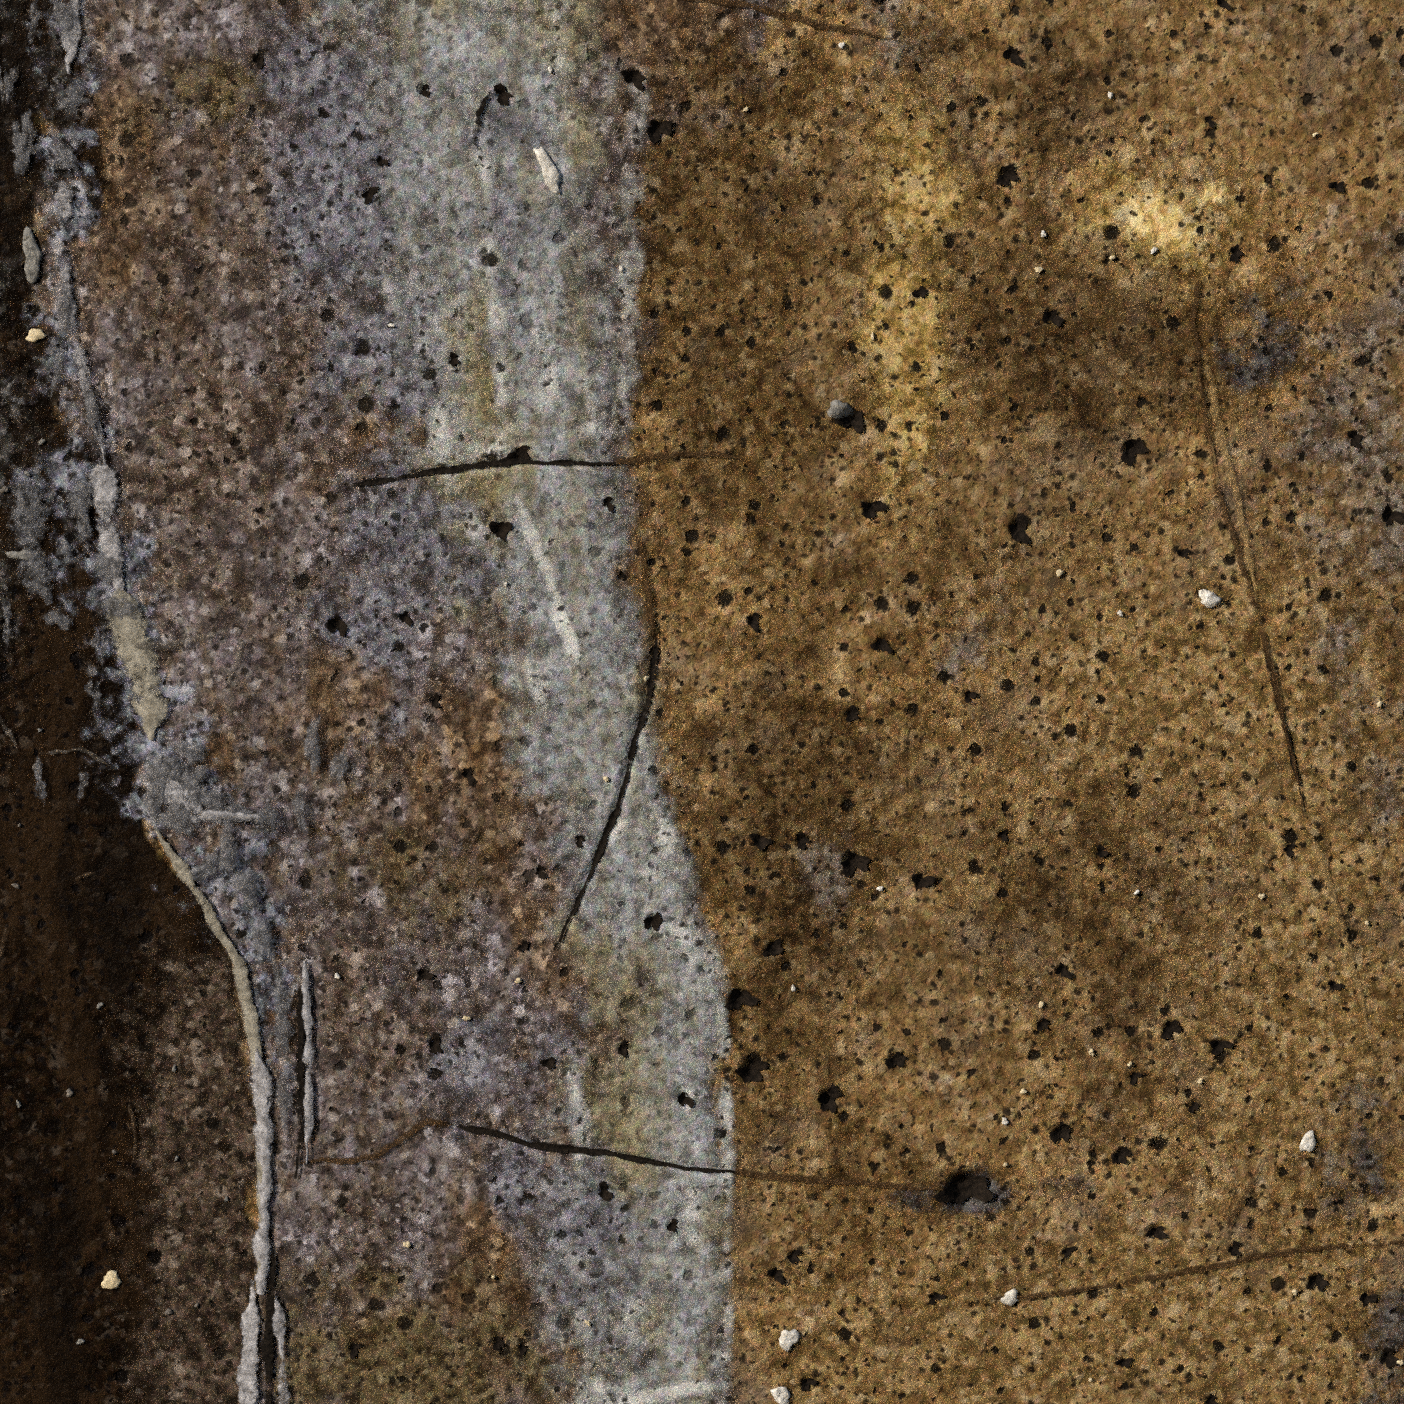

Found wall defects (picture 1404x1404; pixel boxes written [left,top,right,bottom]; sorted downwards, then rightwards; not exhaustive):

crack [688,0,897,40]
crack [351,450,740,487]
water stain [0,0,907,1404]
crack [558,528,658,943]
water stain [878,631,916,664]
water stain [969,812,1114,1003]
crack [294,947,943,1191]